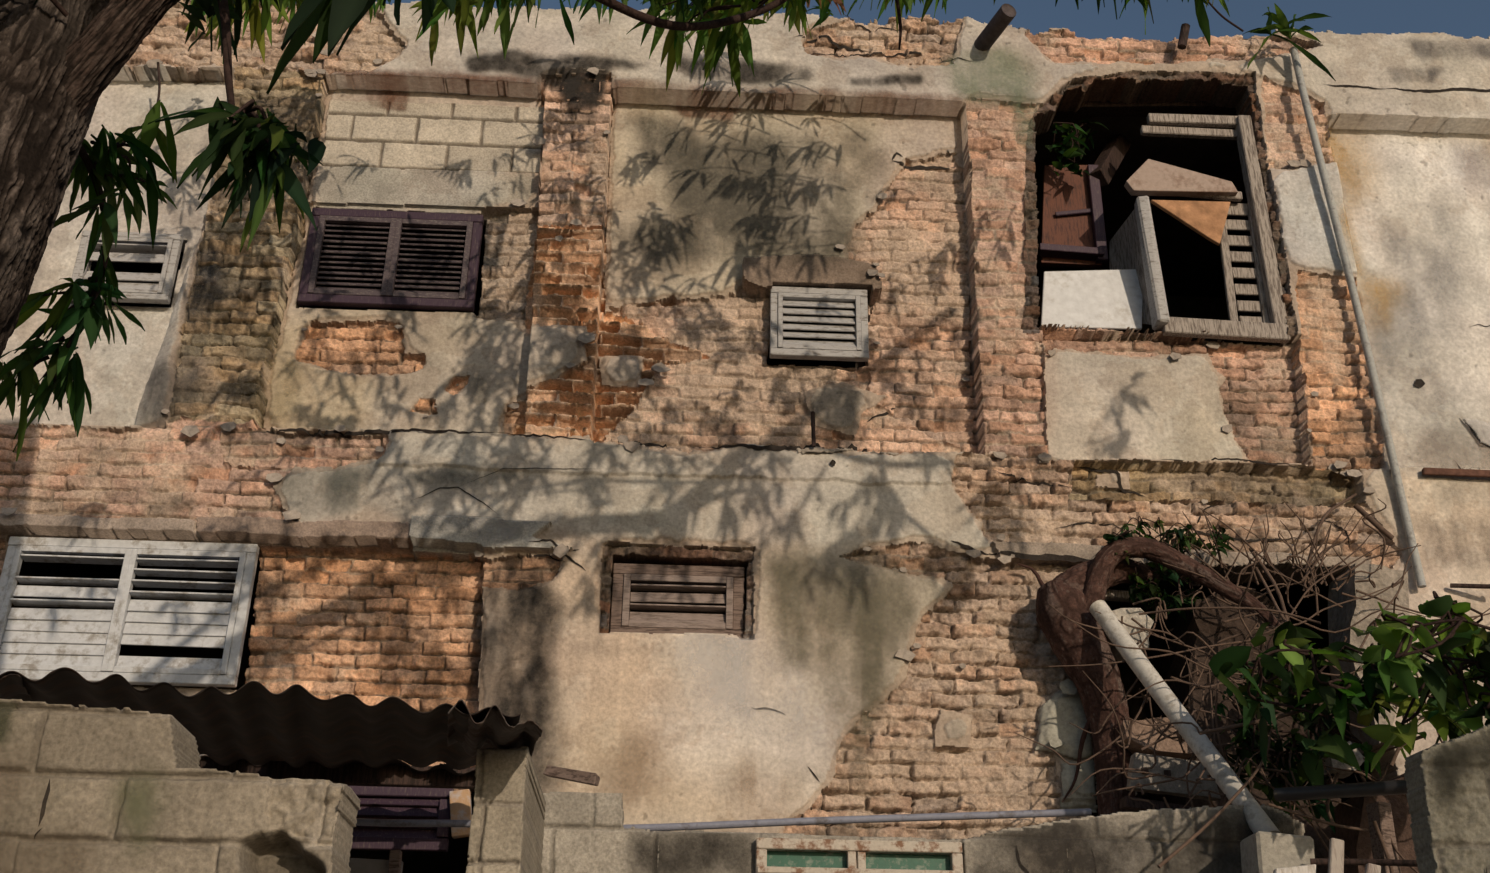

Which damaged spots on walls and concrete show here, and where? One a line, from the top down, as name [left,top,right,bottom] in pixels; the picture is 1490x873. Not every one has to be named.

flaking render [0,0,406,522]
flaking render [297,319,426,375]
damp [634,120,852,263]
flaking render [476,28,1402,854]
damp [478,573,559,782]
damp [778,566,914,728]